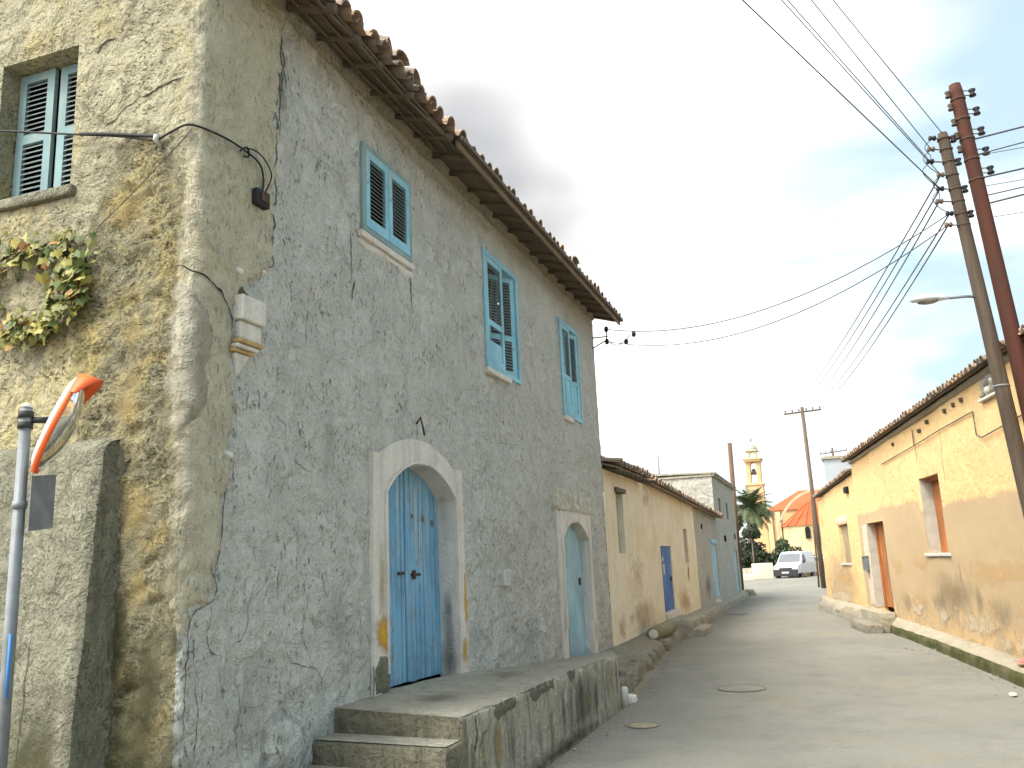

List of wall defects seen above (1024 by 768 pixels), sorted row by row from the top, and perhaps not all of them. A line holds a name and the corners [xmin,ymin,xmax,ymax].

crack [258,23,350,281]
crack [182,490,265,768]
water stain [538,674,618,767]
water stain [857,492,1024,656]